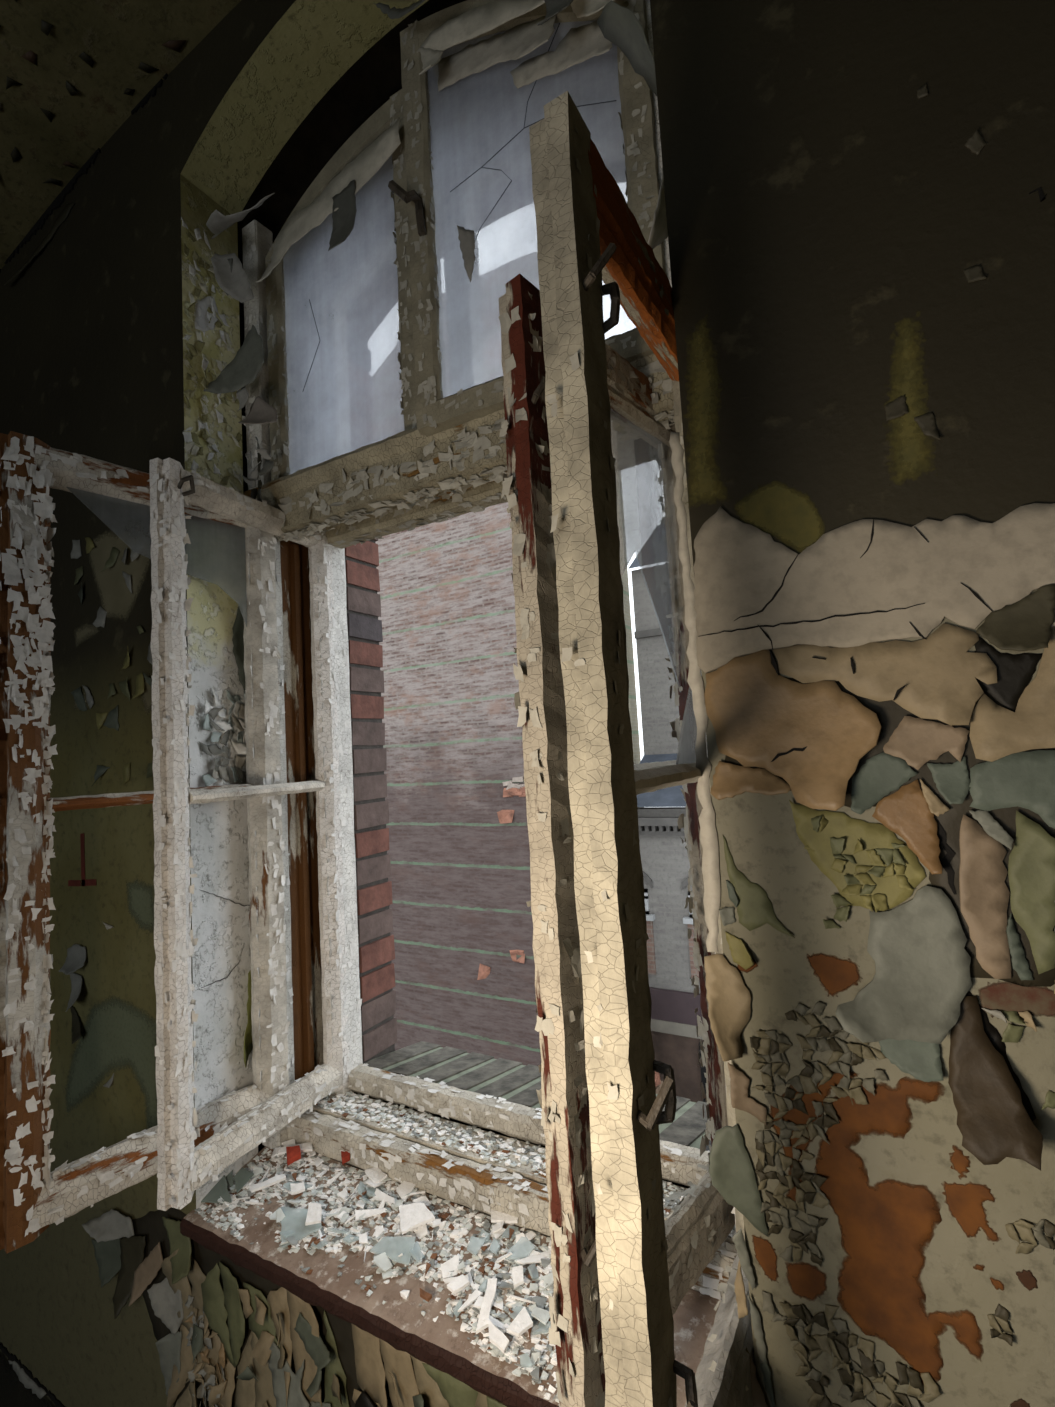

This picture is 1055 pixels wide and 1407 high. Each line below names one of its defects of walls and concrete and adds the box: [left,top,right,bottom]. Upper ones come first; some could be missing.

peeling [181,117,401,485]
crack [860,519,874,558]
crack [698,555,926,675]
crack [961,583,992,611]
crack [771,746,807,762]
flaking render [694,503,1055,1407]
spalling [512,1265,524,1288]
peeling [82,1203,506,1407]
spalling [488,1306,533,1353]